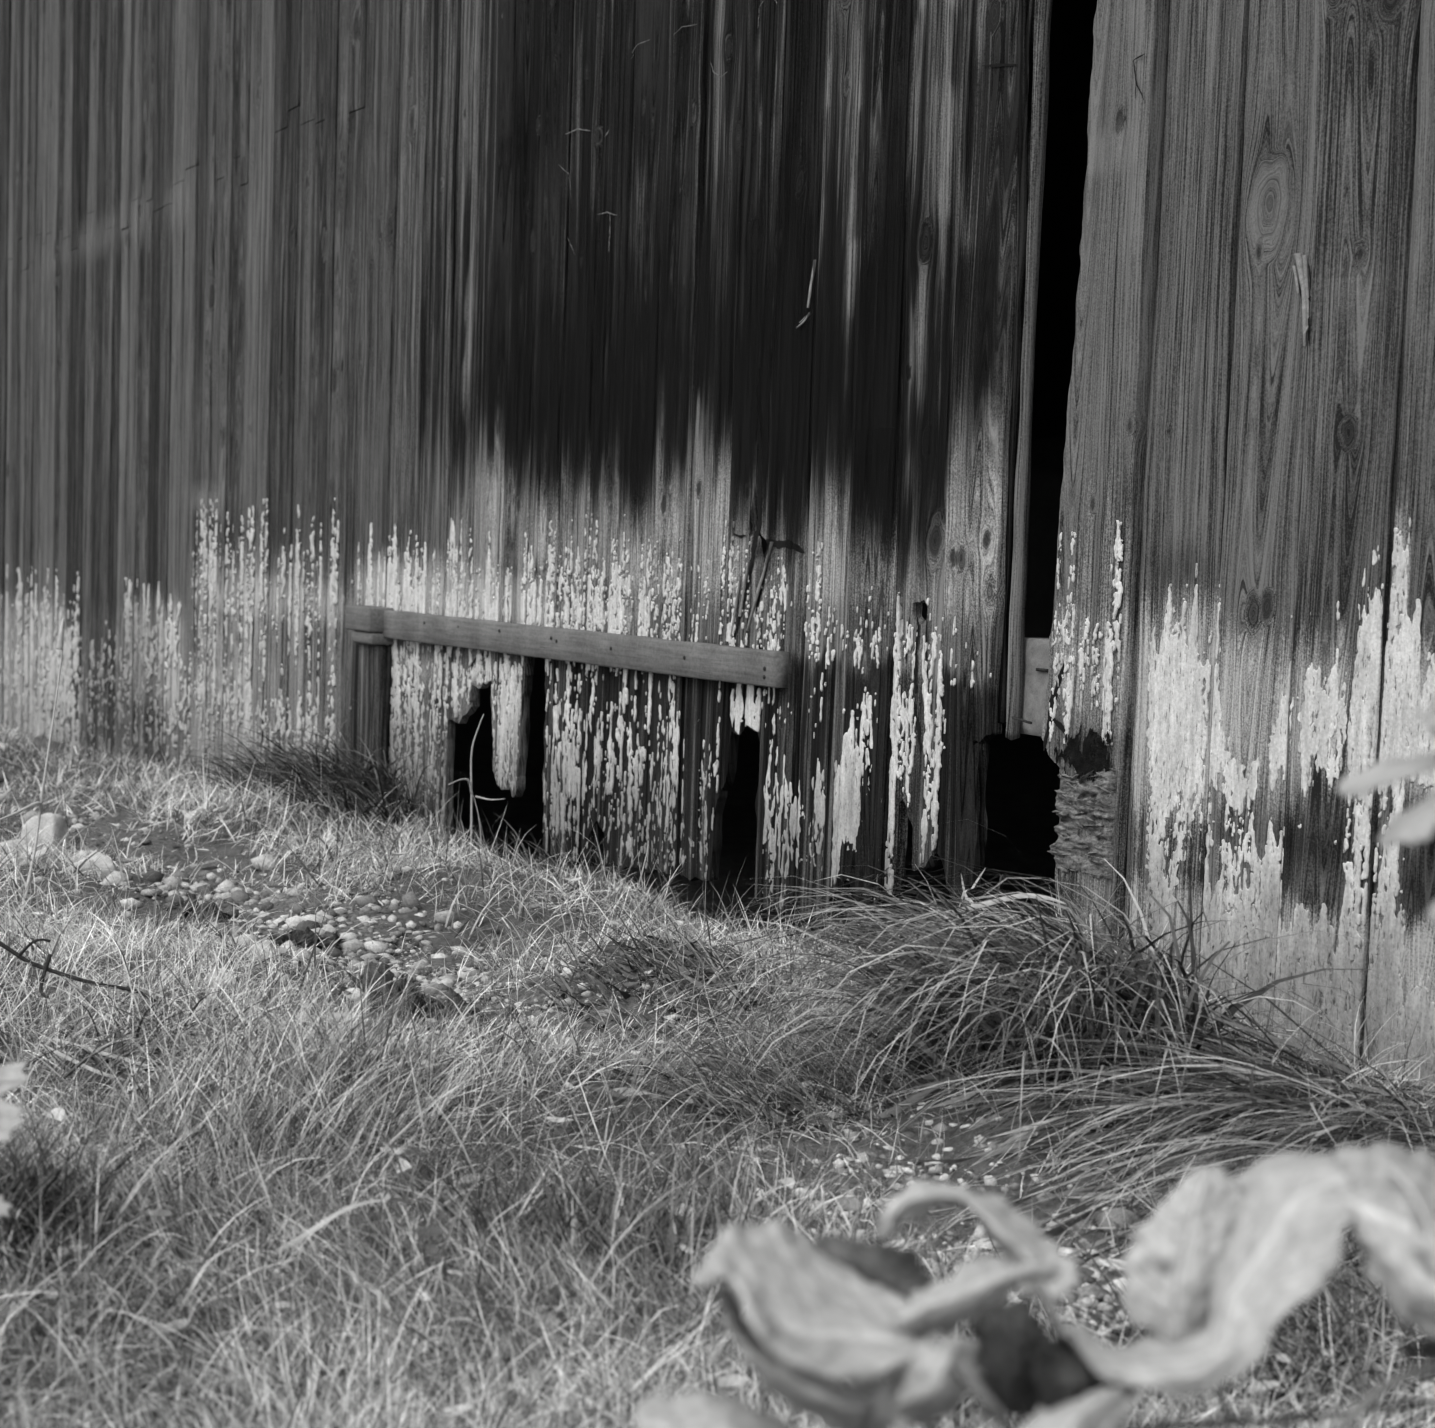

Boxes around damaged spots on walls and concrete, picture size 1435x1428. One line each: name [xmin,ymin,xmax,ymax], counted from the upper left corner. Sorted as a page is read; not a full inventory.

peeling [0,498,992,910]
peeling [1047,770,1104,853]
peeling [1049,520,1124,745]
peeling [1144,518,1435,1092]